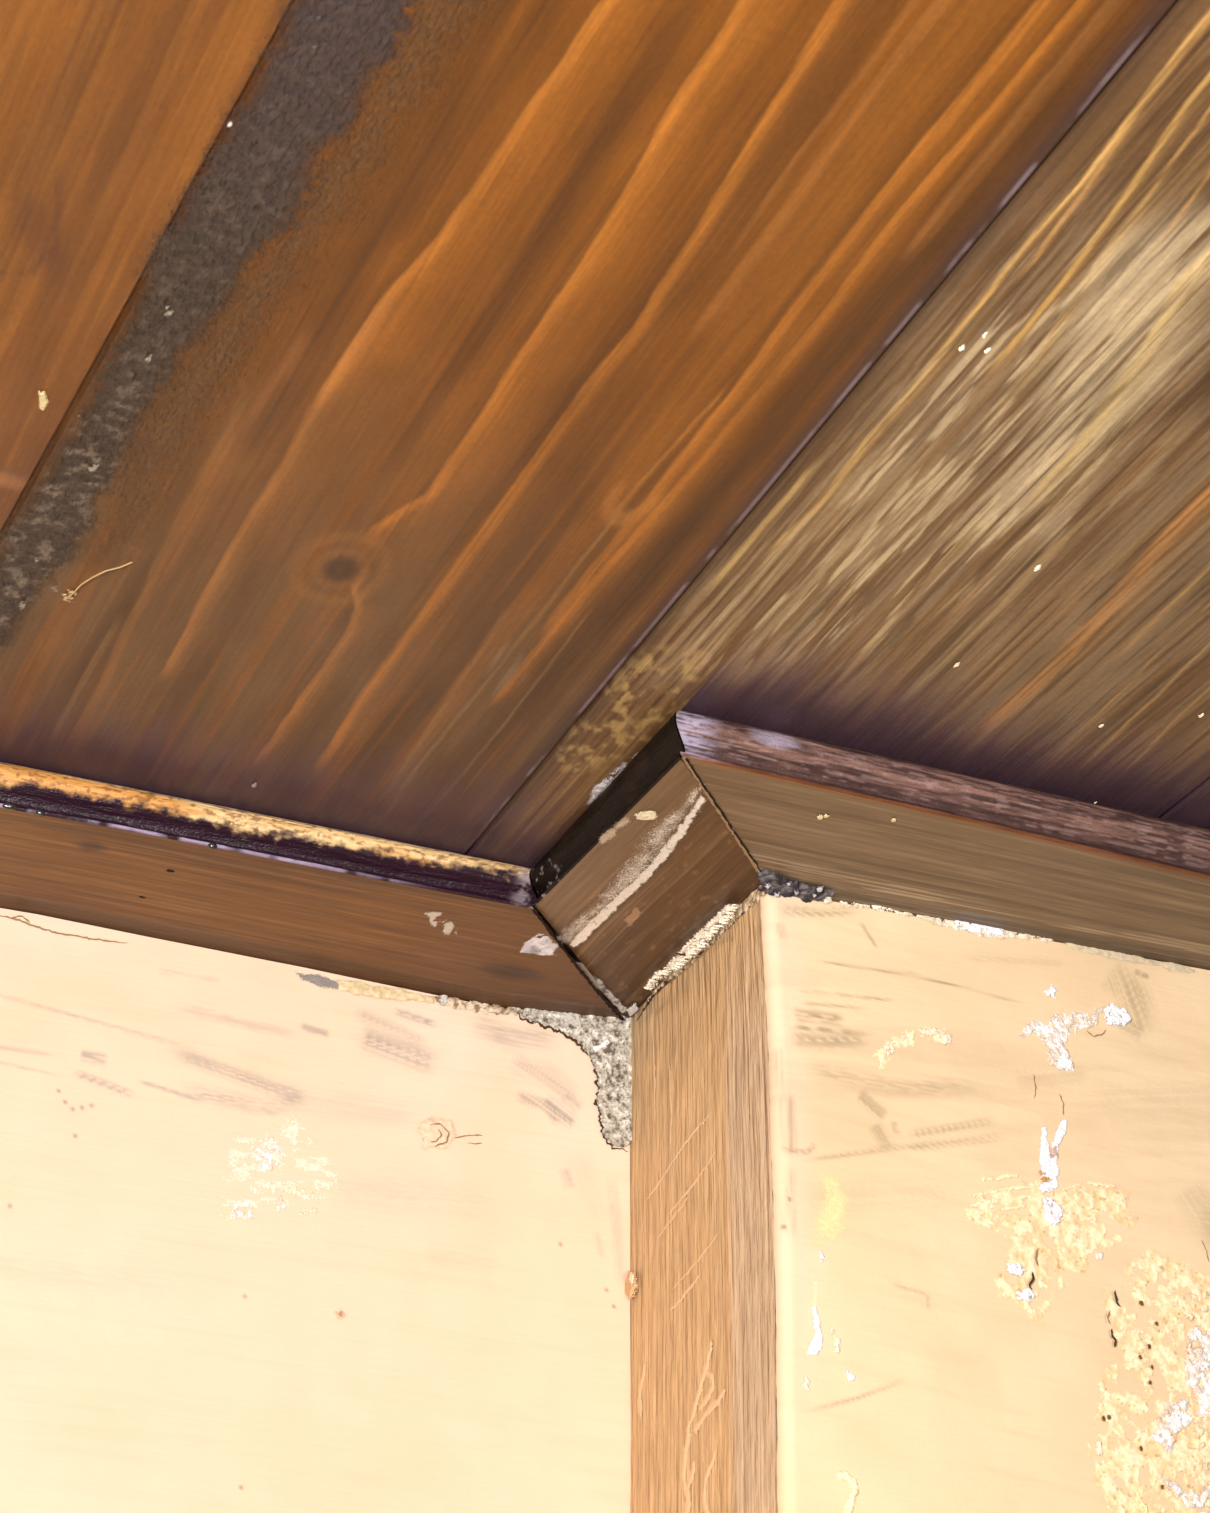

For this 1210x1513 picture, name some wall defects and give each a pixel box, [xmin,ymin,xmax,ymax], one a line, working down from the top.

water stain [0,0,527,663]
peeling [1039,1146,1064,1228]